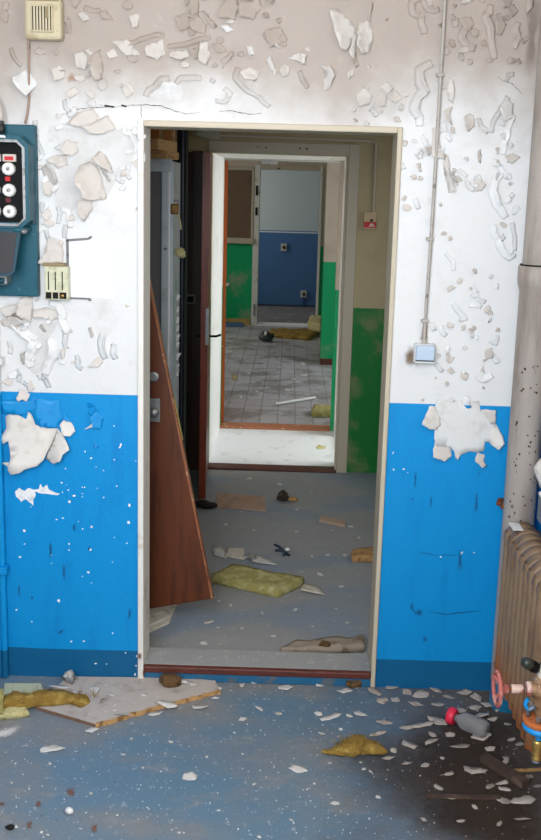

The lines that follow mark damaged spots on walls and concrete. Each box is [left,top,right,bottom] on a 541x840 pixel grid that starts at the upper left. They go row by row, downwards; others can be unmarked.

peeling [9,47,38,96]
peeling [330,2,374,79]
peeling [439,0,534,82]
peeling [32,0,310,265]
peeling [351,59,520,261]
peeling [430,251,500,389]
peeling [0,296,118,475]
peeling [15,482,85,505]
peeling [421,396,505,468]
peeling [533,458,541,488]